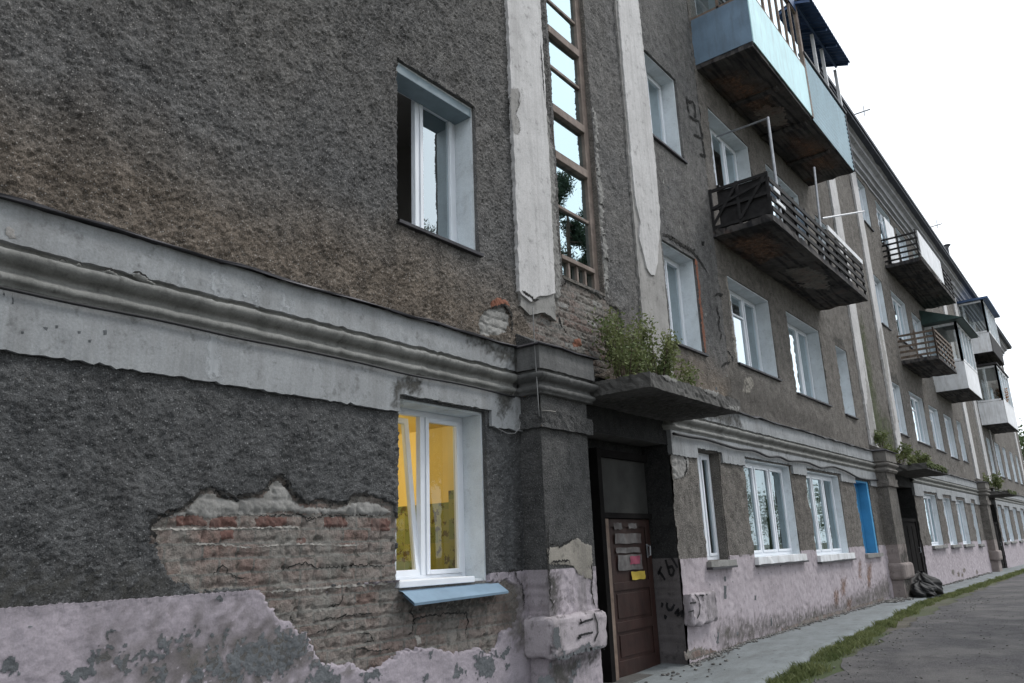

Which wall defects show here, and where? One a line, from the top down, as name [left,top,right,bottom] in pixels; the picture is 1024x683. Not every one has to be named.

flaking render [478,106,621,379]
crack [664,233,734,367]
flaking render [60,475,526,683]
peeling [547,538,593,579]
peeling [0,656,21,677]